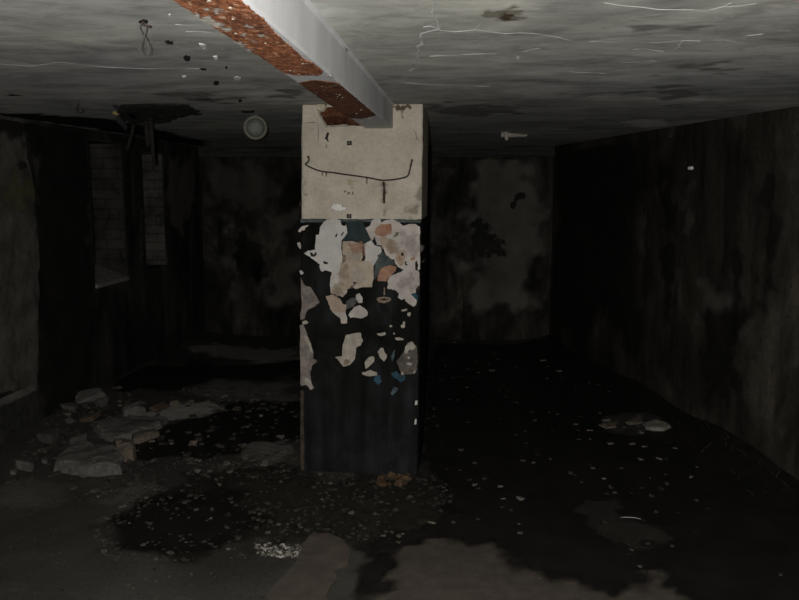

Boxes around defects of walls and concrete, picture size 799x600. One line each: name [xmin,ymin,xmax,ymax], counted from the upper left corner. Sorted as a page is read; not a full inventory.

crack [402,4,566,95]
peeling [297,218,420,390]